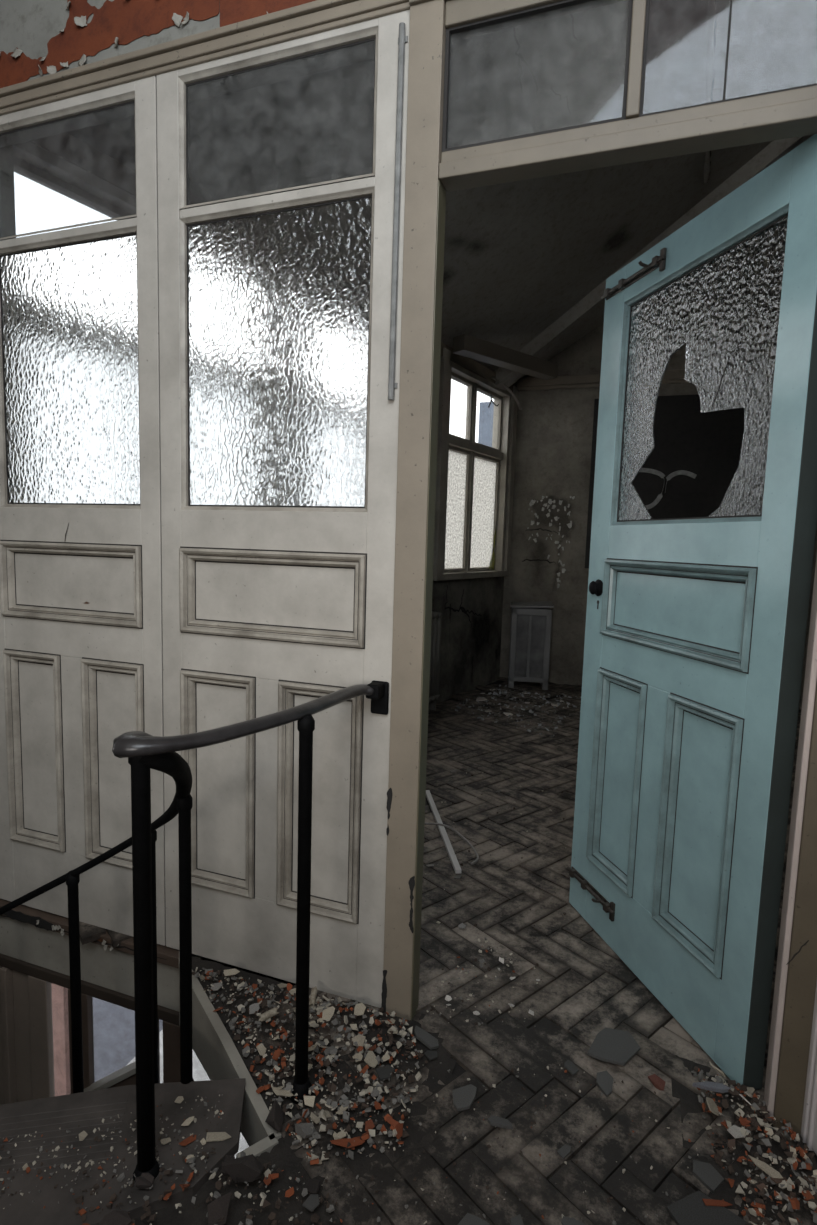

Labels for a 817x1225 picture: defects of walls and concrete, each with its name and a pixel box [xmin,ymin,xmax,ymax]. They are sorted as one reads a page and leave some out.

peeling [0,0,316,88]